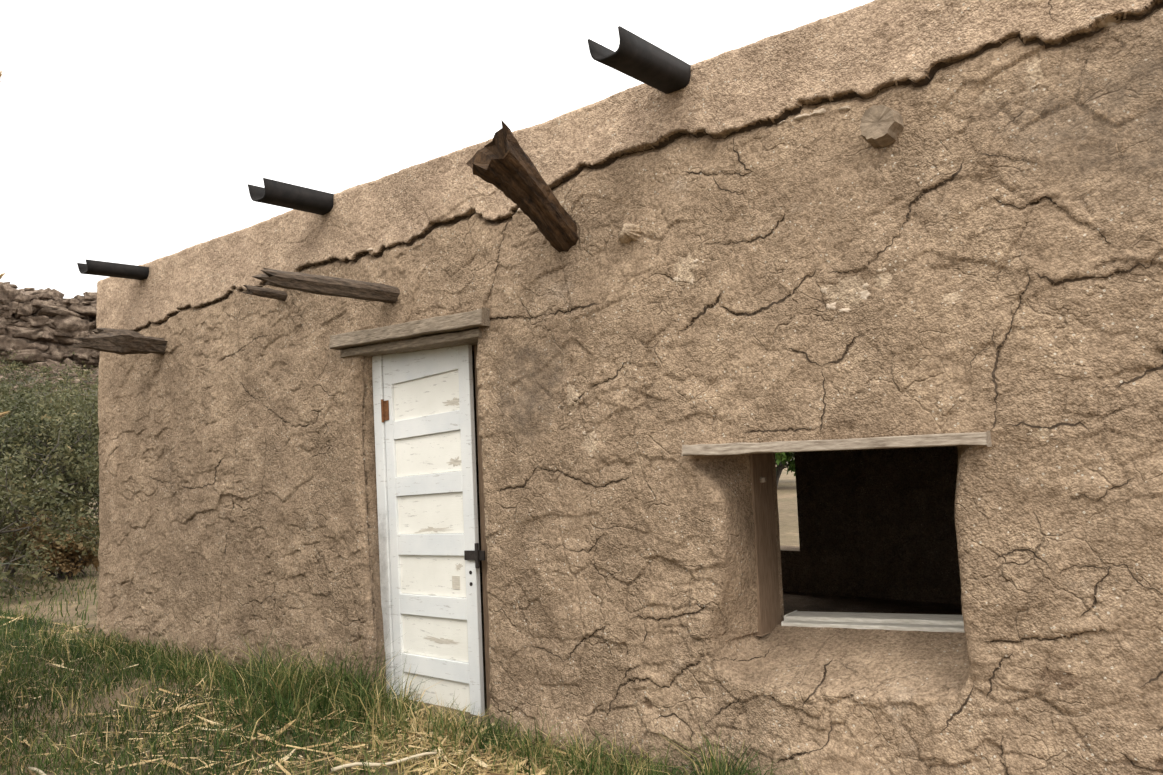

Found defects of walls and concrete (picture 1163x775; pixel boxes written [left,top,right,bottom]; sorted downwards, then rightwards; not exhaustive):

crack [684,138,753,196]
crack [486,216,597,320]
crack [677,153,1041,334]
crack [969,196,1163,441]
crack [568,362,626,414]
crack [748,335,860,436]
crack [497,466,630,491]
crack [532,629,603,674]
crack [607,606,770,769]
crack [800,659,833,707]
crack [941,549,1163,732]
crack [777,721,832,763]